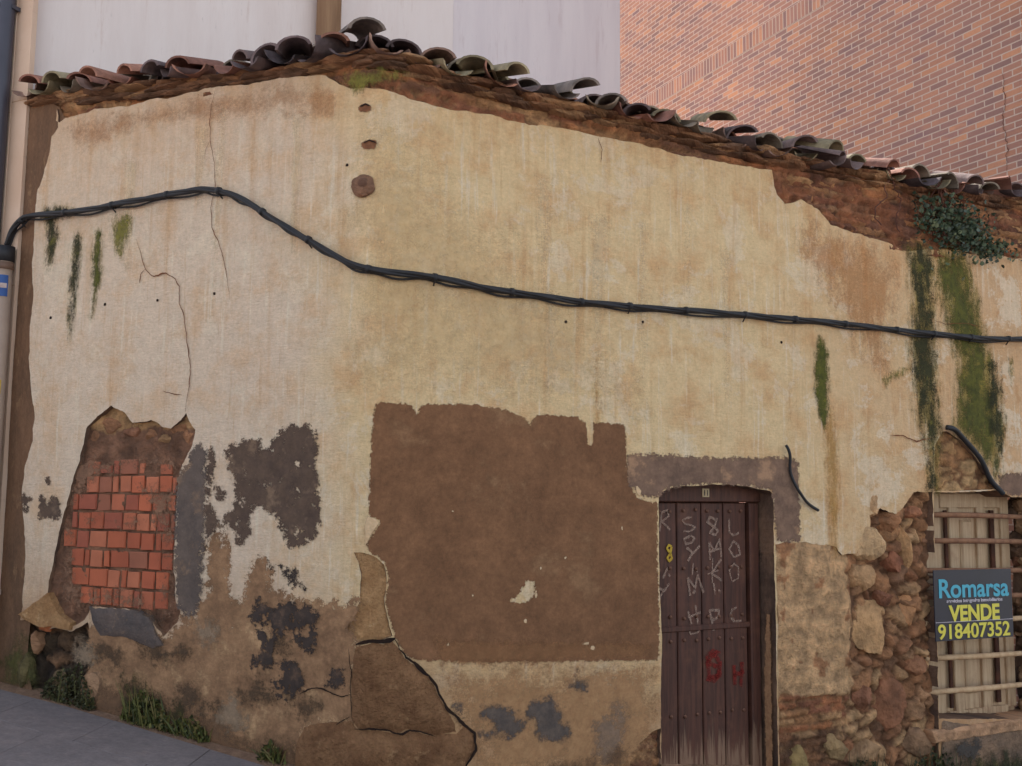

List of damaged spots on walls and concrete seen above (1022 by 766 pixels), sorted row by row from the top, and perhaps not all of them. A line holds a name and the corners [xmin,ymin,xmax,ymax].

water stain [44,207,67,263]
water stain [67,232,81,328]
water stain [91,230,101,311]
water stain [113,215,131,256]
crack [138,246,191,411]
crack [205,92,229,290]
flaking render [765,164,1022,259]
water stain [883,244,1006,491]
flaking render [18,408,195,703]
flaking render [775,432,994,766]
water stain [73,637,323,765]